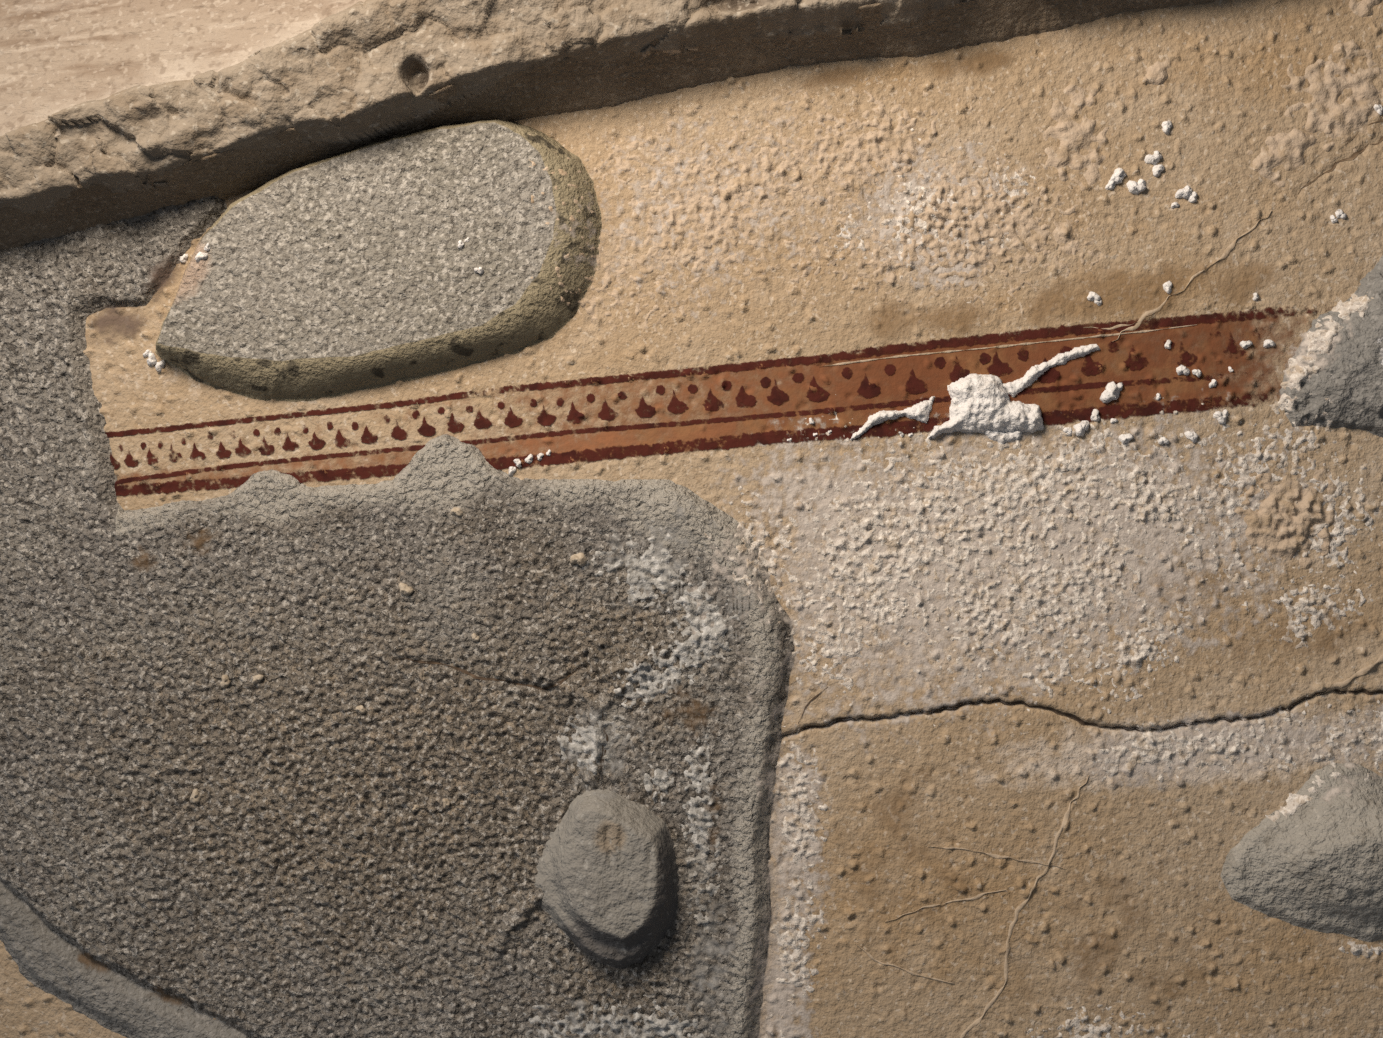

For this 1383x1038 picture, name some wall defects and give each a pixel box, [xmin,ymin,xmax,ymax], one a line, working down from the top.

water stain [529,64,1118,346]
crack [1083,119,1383,342]
water stain [557,292,1383,1038]
crack [783,654,1383,737]
water stain [512,995,704,1038]